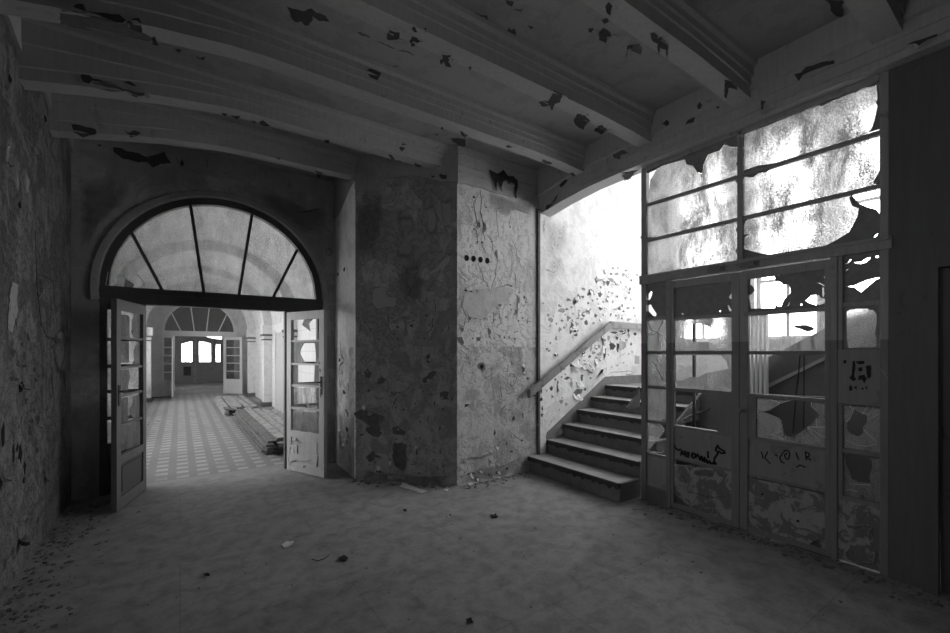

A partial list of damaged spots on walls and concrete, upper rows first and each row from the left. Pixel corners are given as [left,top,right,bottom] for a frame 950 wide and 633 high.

peeling [287,7,329,26]
peeling [650,32,669,57]
peeling [794,60,836,81]
peeling [78,74,151,98]
peeling [539,90,568,110]
peeling [574,114,612,135]
peeling [70,124,184,169]
peeling [488,169,518,198]
crack [457,191,527,411]
peeling [536,267,640,426]
peeling [345,405,447,493]